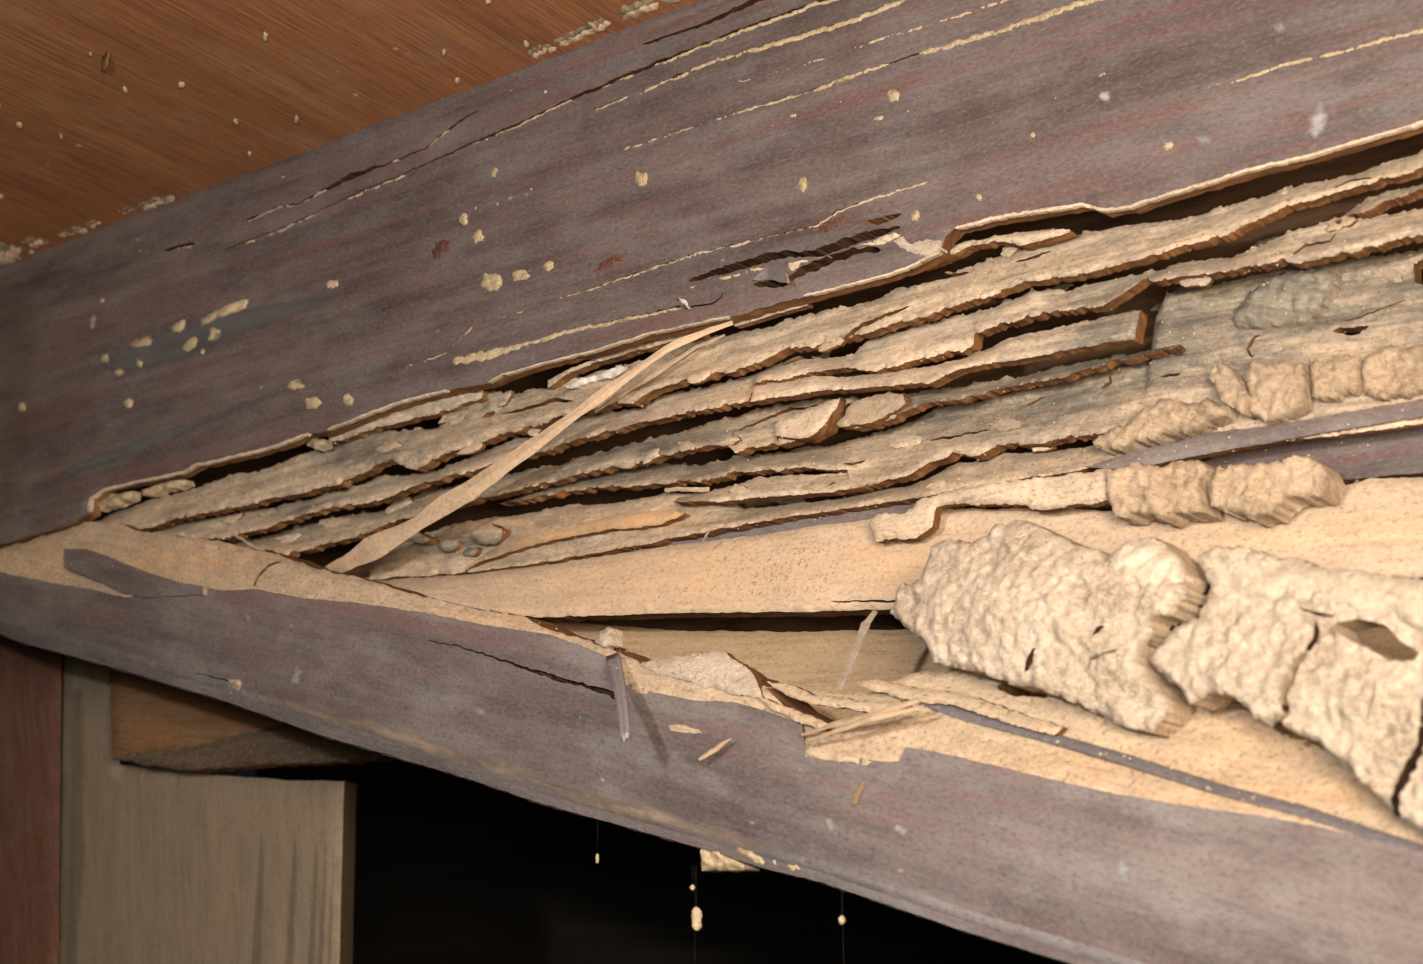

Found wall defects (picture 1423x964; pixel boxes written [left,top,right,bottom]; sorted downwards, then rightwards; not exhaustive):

crack [1205,29,1423,90]
crack [164,0,1103,252]
peeling [1325,216,1358,233]
crack [399,182,947,369]
peeling [1179,276,1214,289]
peeling [687,371,714,385]
peeling [775,391,912,441]
peeling [615,433,743,470]
peeling [869,469,1109,544]
peeling [465,509,690,572]
crack [429,640,615,700]
peeling [606,652,765,742]